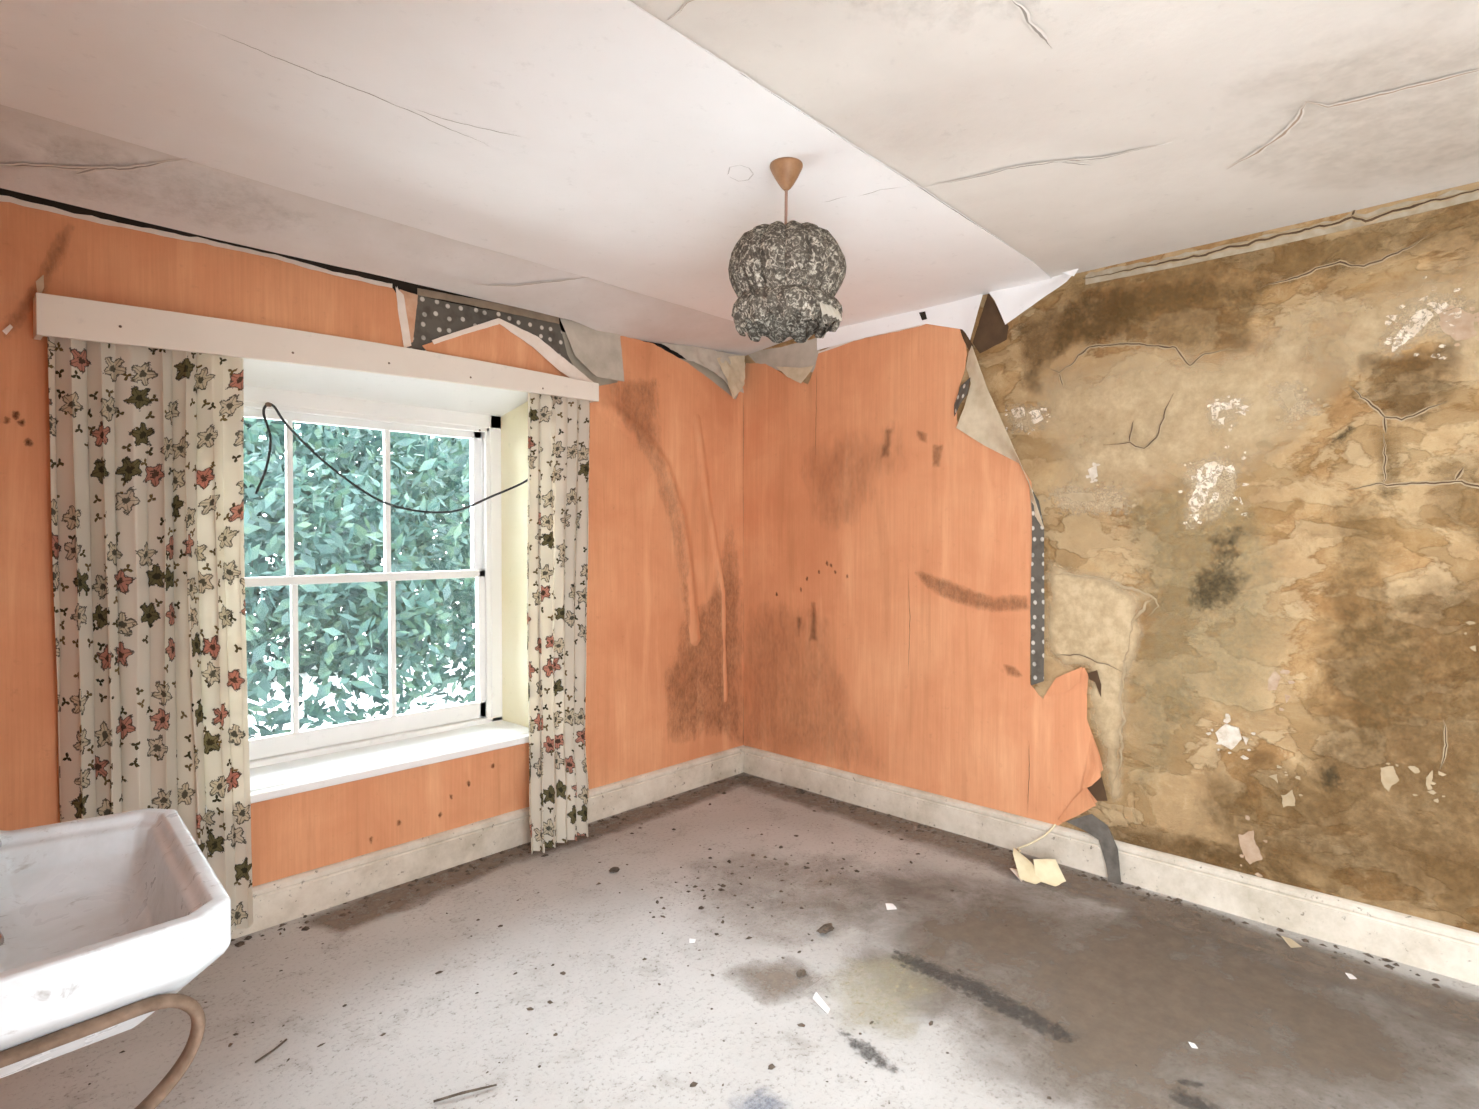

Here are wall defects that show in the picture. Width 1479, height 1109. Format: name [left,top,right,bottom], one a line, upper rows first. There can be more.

crack [183,18,526,152]
crack [645,0,1170,257]
crack [1083,188,1479,290]
flaking render [1381,276,1479,360]
damp [1052,330,1314,487]
flaking render [1178,395,1249,529]
damp [1049,566,1140,796]
damp [1120,833,1253,875]
flaking render [1206,714,1256,760]
flaking render [1238,815,1268,877]
damp [1223,600,1479,900]
flaking render [1380,763,1446,803]